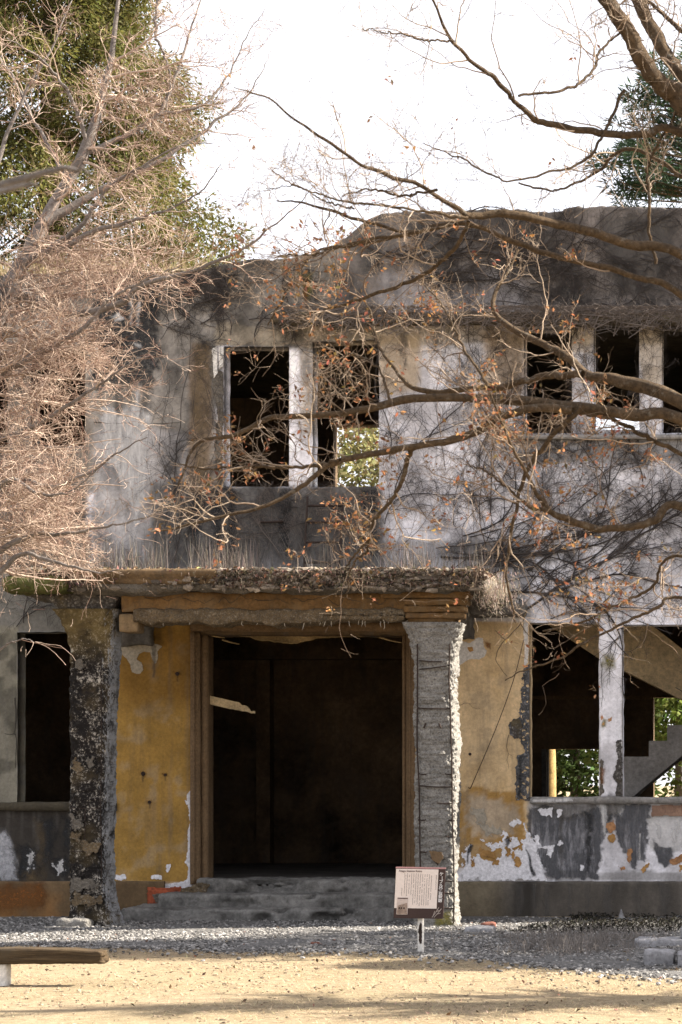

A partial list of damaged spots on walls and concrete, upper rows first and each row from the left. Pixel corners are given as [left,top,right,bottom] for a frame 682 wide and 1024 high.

water stain [89,266,160,533]
spalling [52,607,547,927]
spalling [599,739,623,843]
flaking render [651,805,682,817]